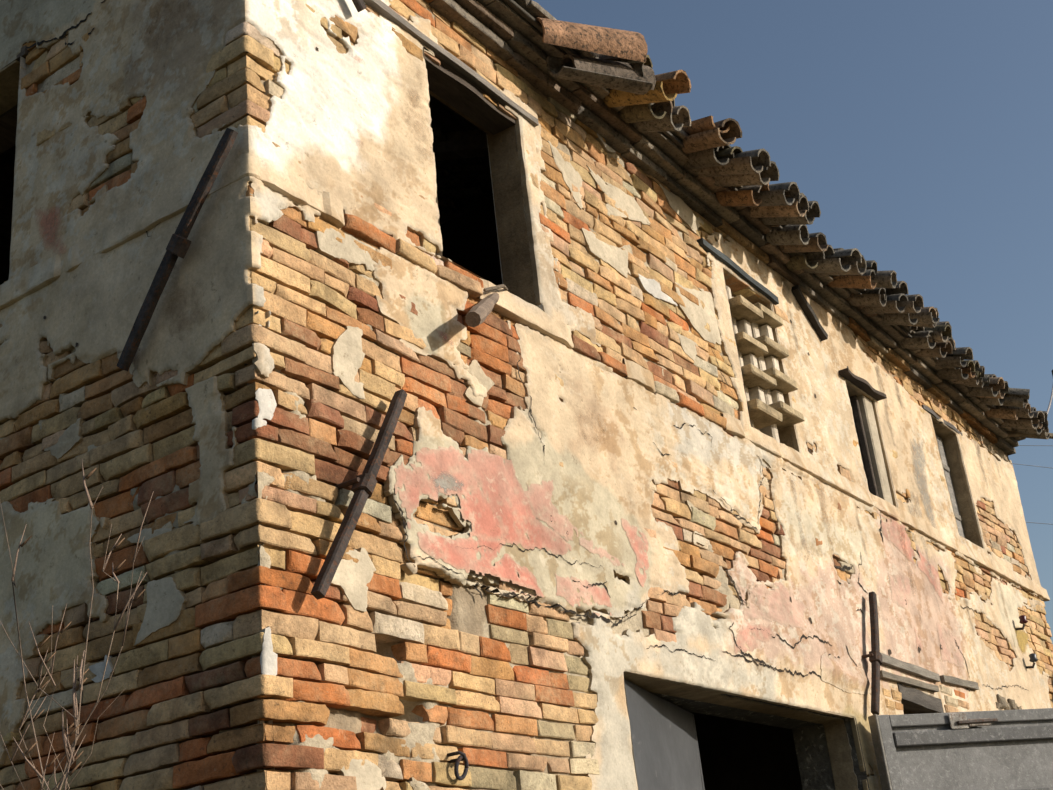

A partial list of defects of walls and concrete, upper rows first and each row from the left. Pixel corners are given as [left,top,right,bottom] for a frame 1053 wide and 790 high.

flaking render [21,32,89,96]
crack [22,0,105,53]
flaking render [190,22,290,147]
flaking render [305,4,358,54]
flaking render [67,96,147,216]
flaking render [365,0,760,437]
flaking render [0,207,812,790]
flaking render [896,489,911,503]
crack [392,498,685,626]
crack [647,571,857,677]
flaking render [864,498,1053,710]
flaking render [939,685,969,713]